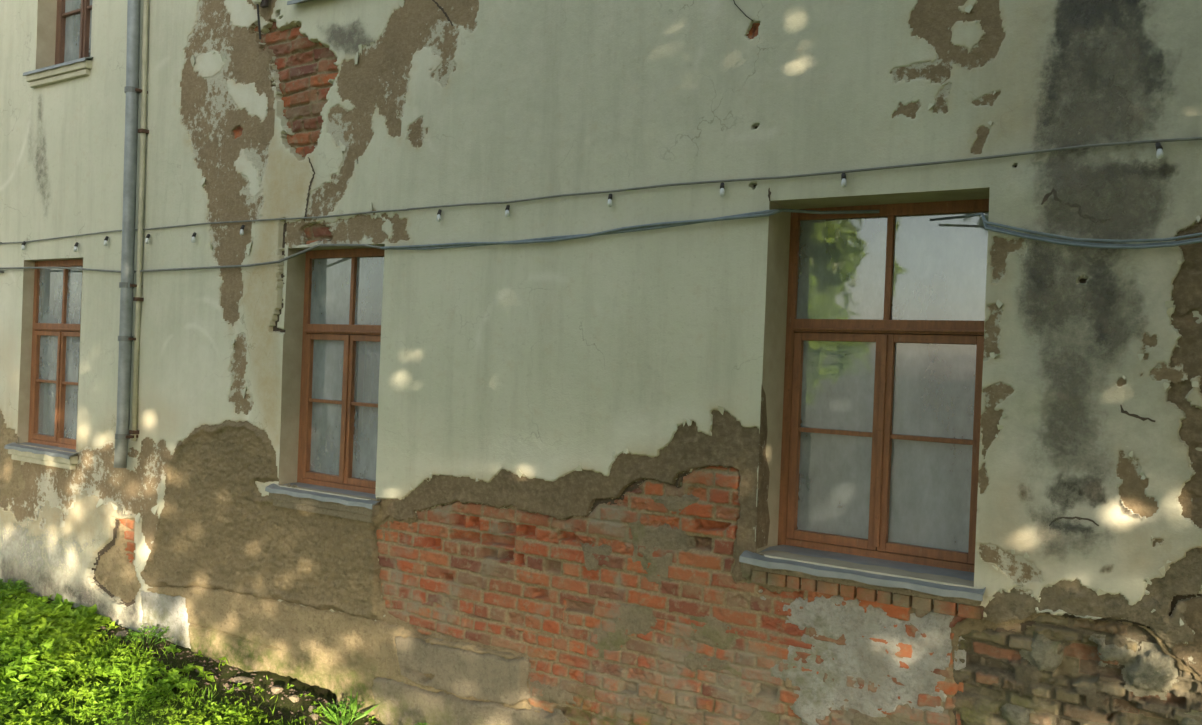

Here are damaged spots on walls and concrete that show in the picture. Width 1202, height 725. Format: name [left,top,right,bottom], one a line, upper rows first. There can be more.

peeling [890,0,1006,119]
peeling [971,121,992,155]
flaking render [0,0,940,725]
peeling [983,300,1003,361]
peeling [990,235,1027,284]
damp [1023,0,1174,553]
spalling [1137,215,1202,528]
peeling [978,382,1014,494]
peeling [1115,446,1159,518]
flaking render [846,543,1202,725]